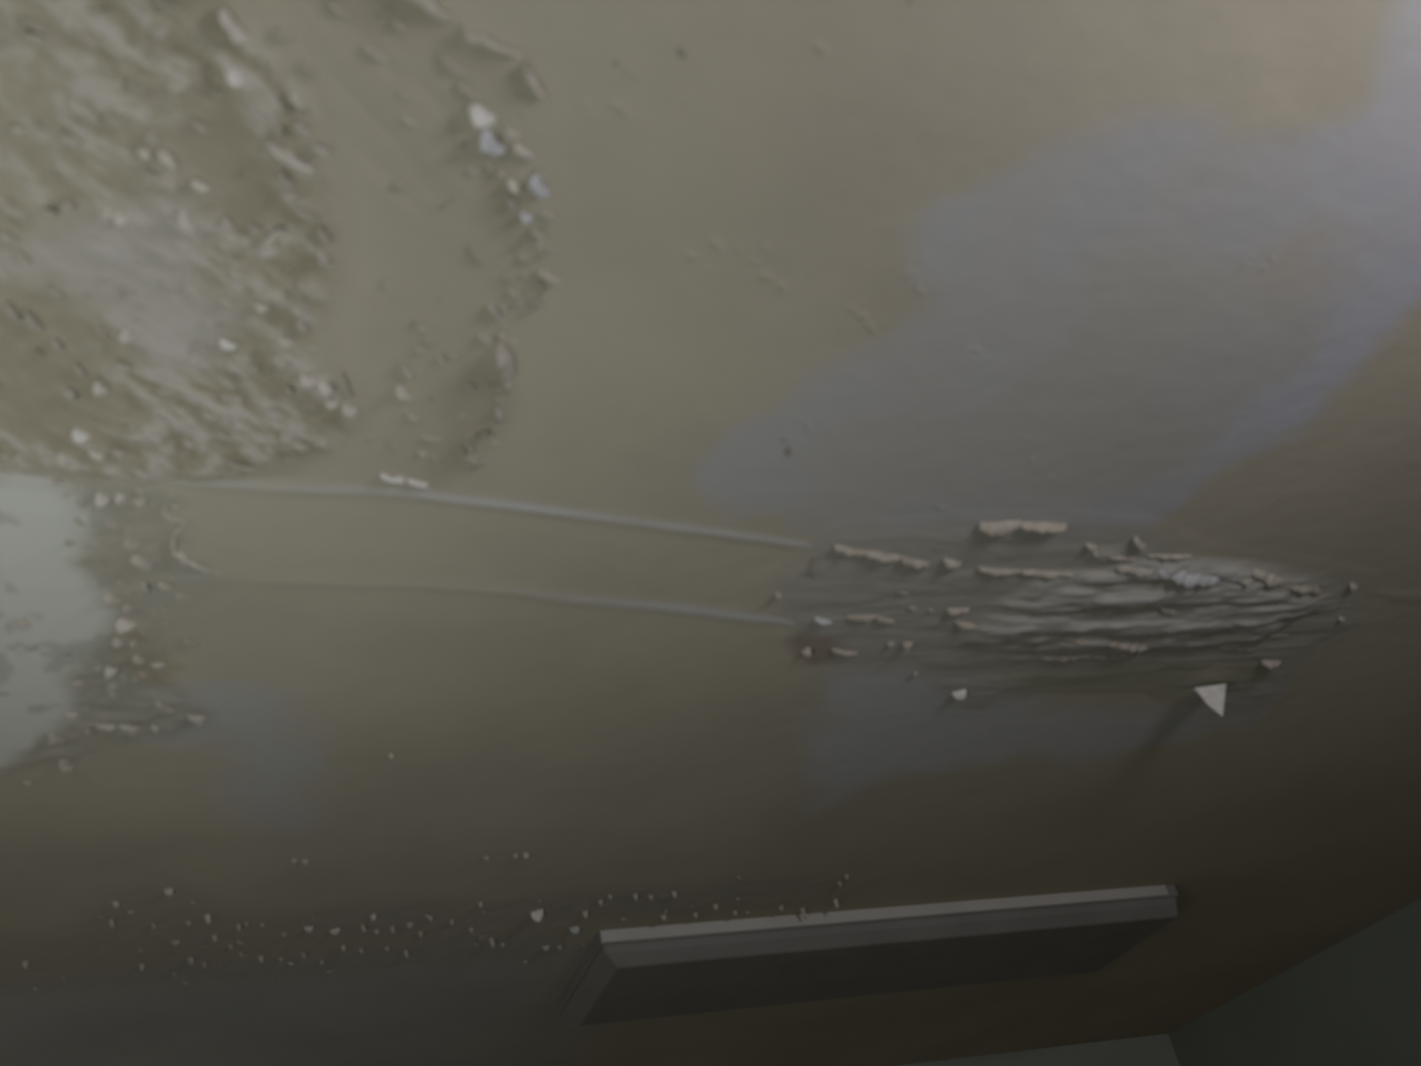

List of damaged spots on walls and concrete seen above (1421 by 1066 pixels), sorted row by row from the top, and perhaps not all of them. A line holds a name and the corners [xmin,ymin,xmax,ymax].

leakage [639,0,1421,537]
peeling [0,0,369,790]
flaking render [746,508,1387,727]
leakage [750,660,1334,829]
peeling [0,855,884,1005]